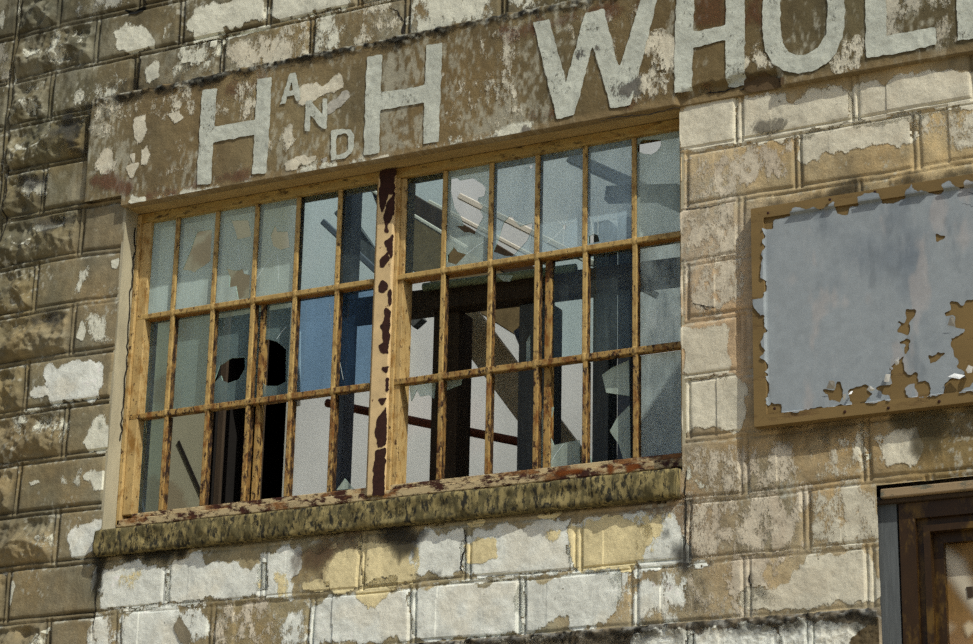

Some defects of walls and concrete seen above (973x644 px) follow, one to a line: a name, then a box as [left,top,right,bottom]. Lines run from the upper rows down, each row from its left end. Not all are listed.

peeling [76,0,166,83]
peeling [74,74,195,178]
peeling [353,0,493,45]
peeling [436,26,534,147]
peeling [595,28,676,102]
rust [378,168,396,268]
peeling [679,35,973,435]
rust [378,280,392,354]
peeling [13,359,104,443]
peeling [83,414,108,454]
rust [372,366,389,496]
peeling [87,427,921,644]